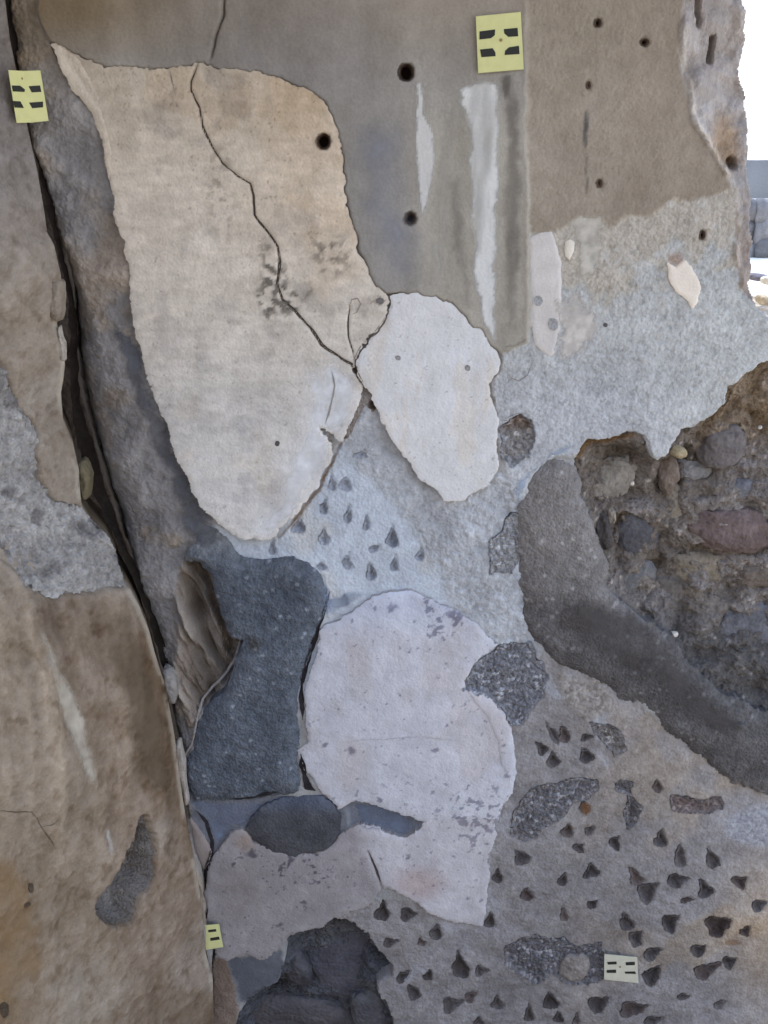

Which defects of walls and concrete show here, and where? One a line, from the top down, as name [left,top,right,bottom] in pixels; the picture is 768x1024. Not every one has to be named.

crack [170,0,390,439]
water stain [416,83,435,215]
water stain [461,83,519,336]
flaking render [574,361,768,732]